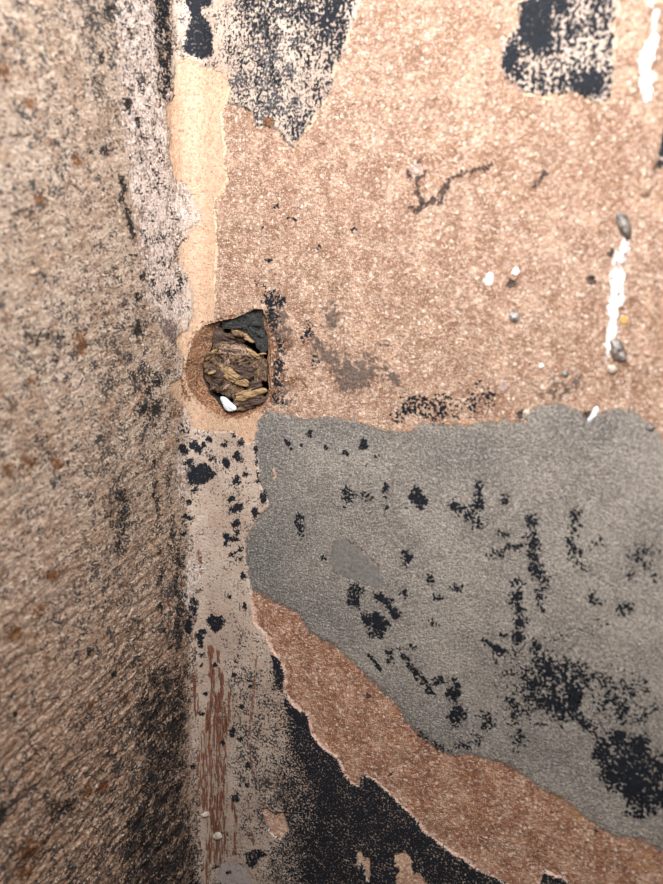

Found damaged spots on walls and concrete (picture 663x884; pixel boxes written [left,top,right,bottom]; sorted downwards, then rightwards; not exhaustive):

damp [499,0,617,103]
damp [89,0,358,341]
peeling [157,0,663,443]
damp [108,476,133,557]
damp [126,368,168,426]
damp [318,437,381,465]
damp [339,481,390,511]
damp [117,417,268,884]
corrosion [192,644,237,884]
damp [245,653,506,884]
peeling [249,588,663,884]
damp [540,870,569,884]